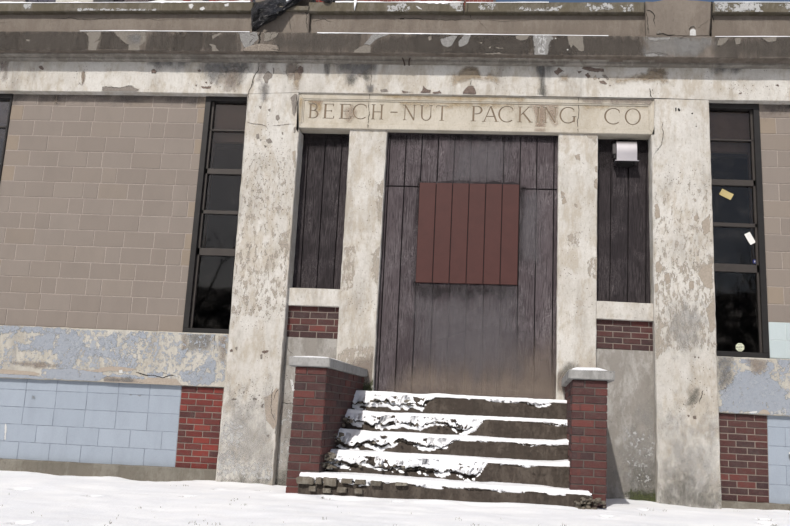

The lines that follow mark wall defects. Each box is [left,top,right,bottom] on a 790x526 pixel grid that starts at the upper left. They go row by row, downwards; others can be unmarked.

peeling [86,31,101,50]
spalling [238,32,279,51]
peeling [354,34,389,53]
peeling [428,35,471,47]
peeling [516,34,567,80]
peeling [567,36,584,51]
peeling [645,25,741,57]
peeling [578,67,611,86]
peeling [259,65,280,121]
peeling [231,134,296,328]
peeling [654,164,790,419]
peeling [0,325,237,386]